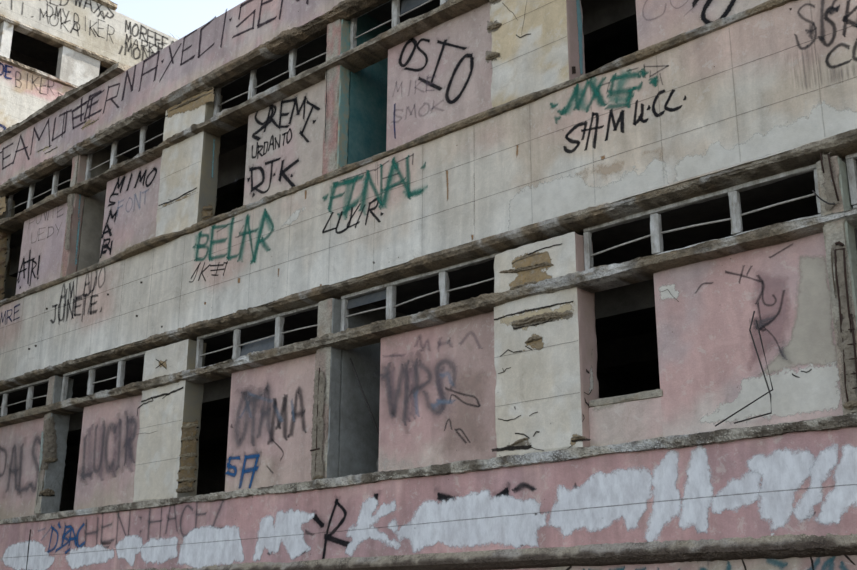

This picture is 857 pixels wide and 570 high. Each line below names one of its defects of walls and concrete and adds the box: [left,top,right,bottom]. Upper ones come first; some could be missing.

spalling [0,232,8,300]
spalling [499,243,562,290]
spalling [494,301,573,356]
peeling [700,241,857,423]
spalling [176,420,199,493]